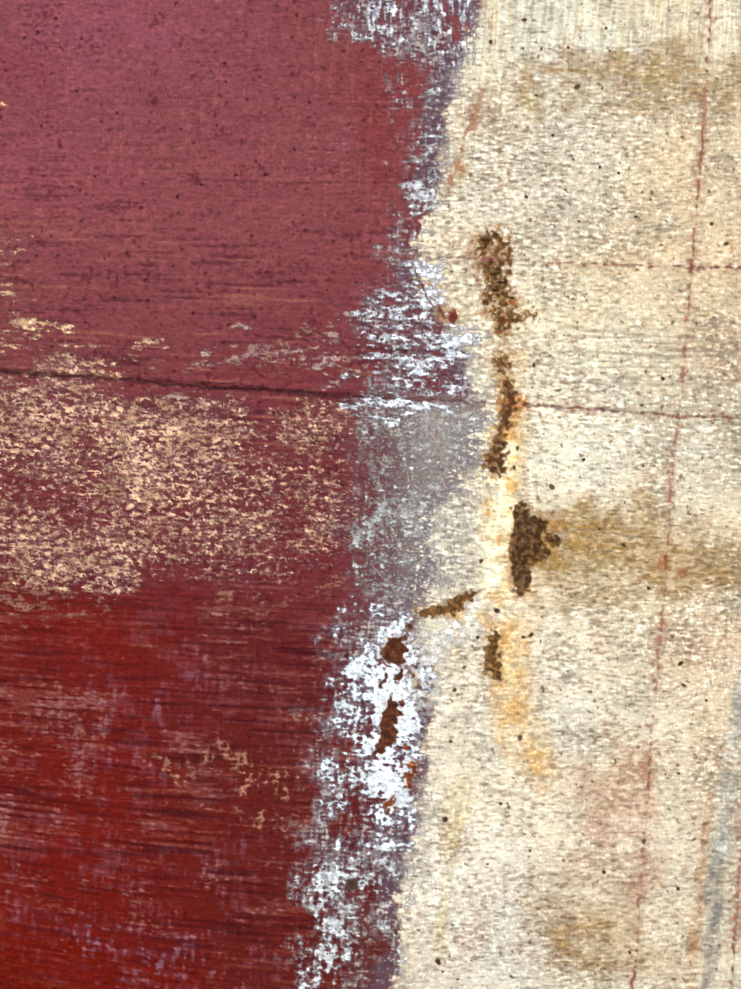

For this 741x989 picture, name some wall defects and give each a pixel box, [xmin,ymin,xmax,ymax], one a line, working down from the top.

peeling [326,0,492,75]
corrosion [470,224,538,380]
crack [0,370,98,380]
crack [124,378,434,401]
corrosion [496,396,530,432]
peeling [0,113,521,989]
leakage [534,502,741,594]